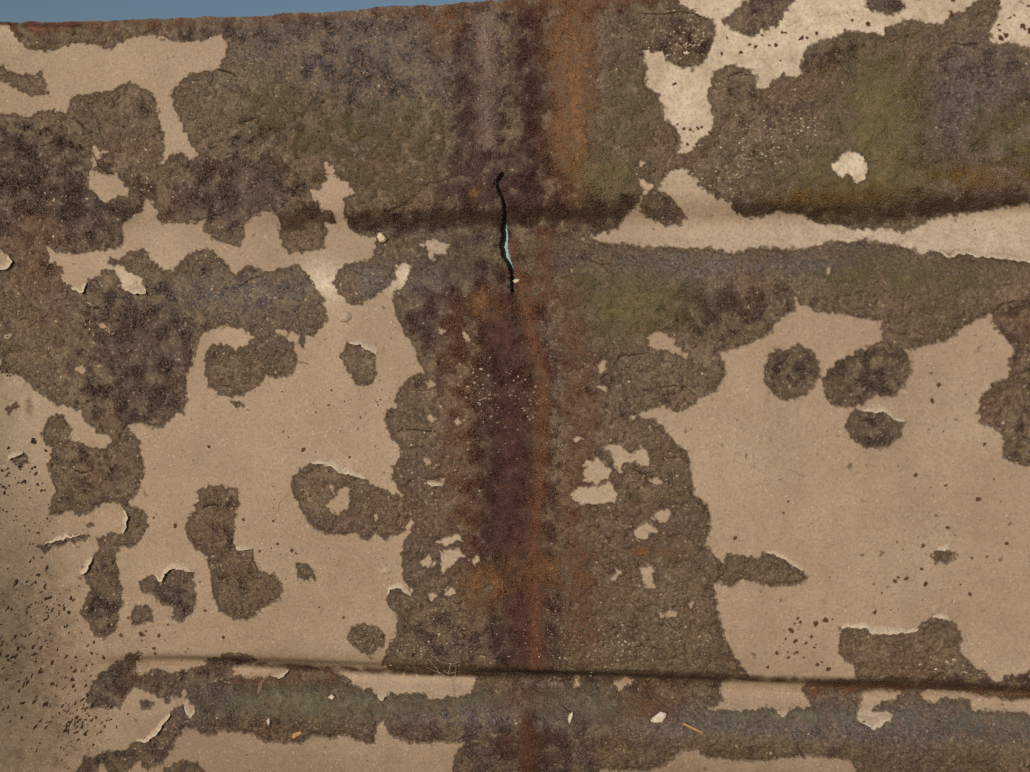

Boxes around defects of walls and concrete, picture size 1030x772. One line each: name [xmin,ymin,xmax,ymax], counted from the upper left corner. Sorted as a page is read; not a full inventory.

peeling [0,4,468,637]
crack [485,162,515,295]
rust [467,281,551,672]
rust [440,0,627,225]
peeling [79,218,1030,772]
peeling [454,0,1030,465]